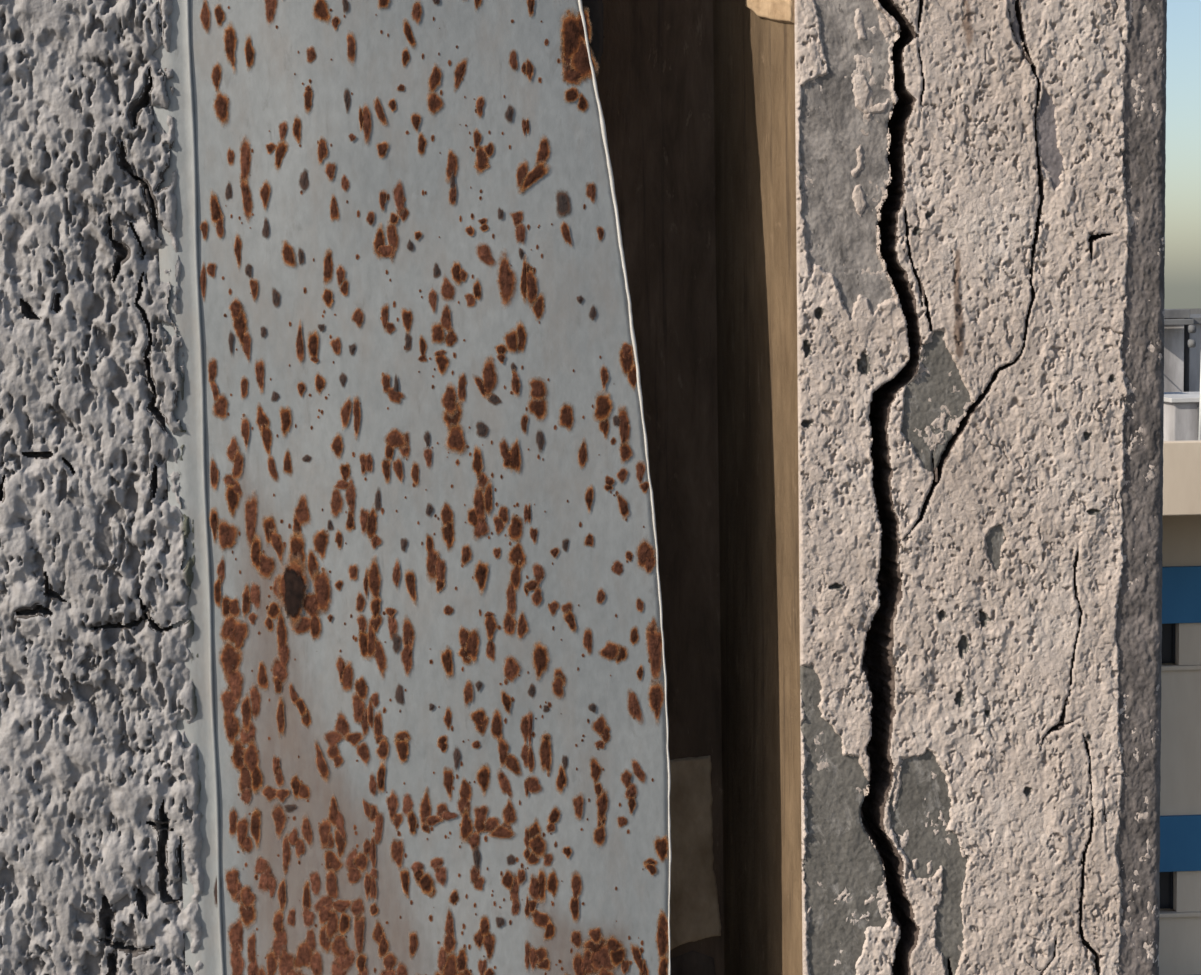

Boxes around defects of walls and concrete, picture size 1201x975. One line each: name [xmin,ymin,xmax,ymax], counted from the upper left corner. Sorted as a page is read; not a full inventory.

rust [200,0,255,124]
rust [265,0,278,29]
rust [313,0,355,62]
rust [402,0,597,324]
flaking render [745,0,795,25]
peeling [799,0,896,318]
crack [90,588,190,635]
rust [200,73,669,975]
peeling [800,664,891,975]
peeling [887,749,968,975]
crack [860,0,1046,975]
crack [1021,551,1109,975]